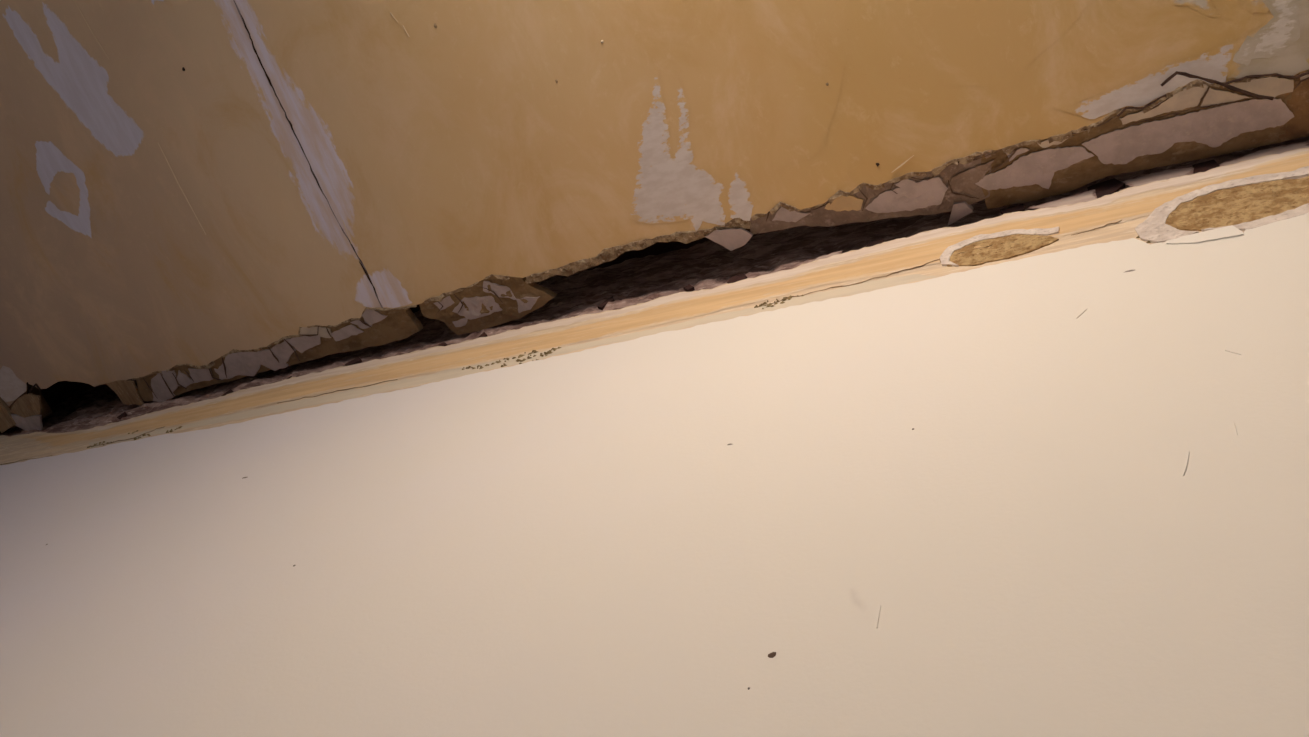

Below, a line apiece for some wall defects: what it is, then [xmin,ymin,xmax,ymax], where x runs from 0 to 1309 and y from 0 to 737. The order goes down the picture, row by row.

crack [234,1,383,308]
flaking render [0,0,1309,465]